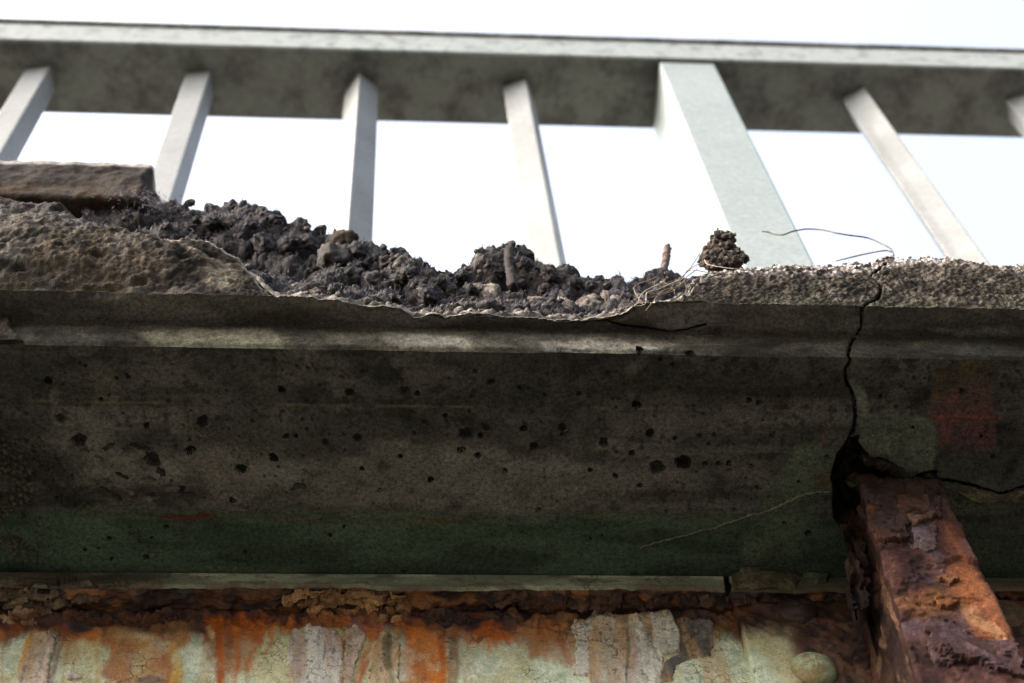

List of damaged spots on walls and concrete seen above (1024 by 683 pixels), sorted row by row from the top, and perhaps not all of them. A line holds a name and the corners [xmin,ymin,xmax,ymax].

spalling [81,190,715,322]
crack [596,319,706,331]
crack [844,264,887,438]
crack [938,477,1024,505]
rust [858,477,1024,678]
peeling [0,583,186,683]
rust [0,607,592,683]
peeling [282,588,501,683]
peeling [542,590,714,683]
rust [671,608,743,659]